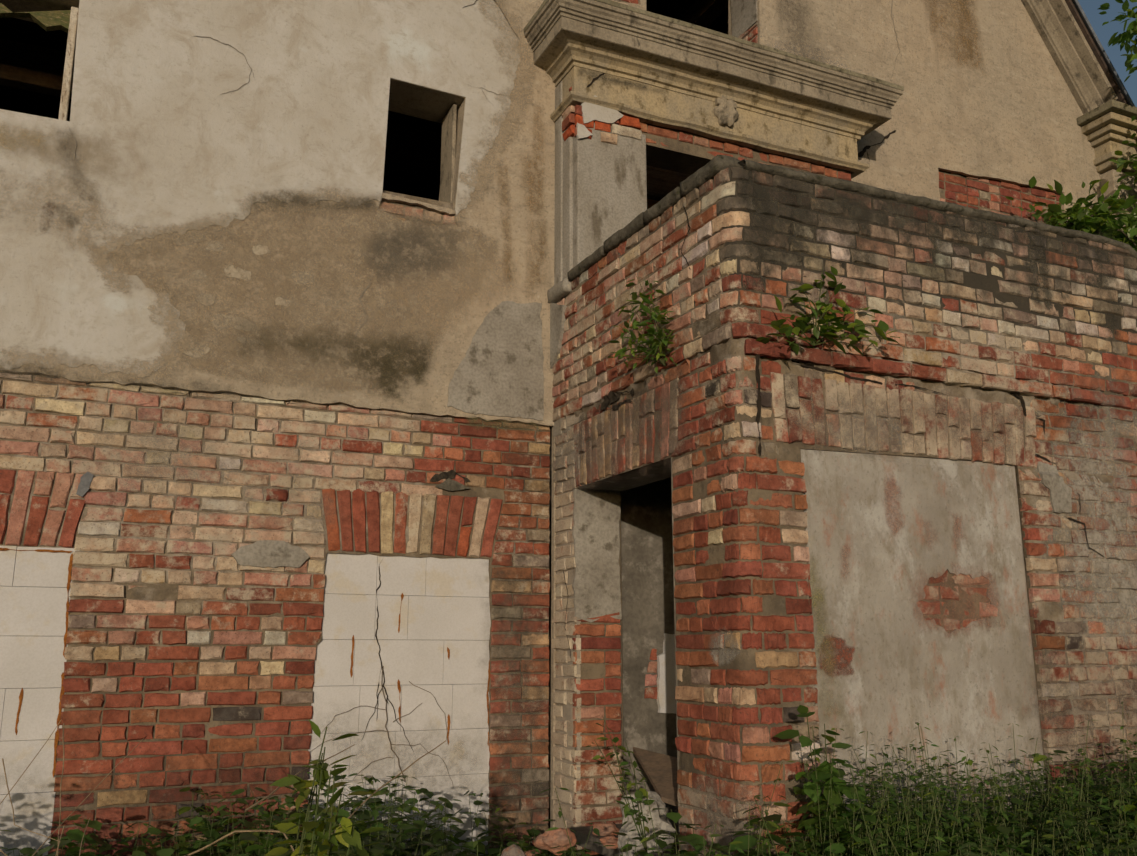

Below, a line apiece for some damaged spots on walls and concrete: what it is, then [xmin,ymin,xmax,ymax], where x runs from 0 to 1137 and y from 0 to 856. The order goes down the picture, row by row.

crack [197,36,254,94]
flaking render [562,86,851,181]
flaking render [938,170,1061,224]
water stain [355,341,425,395]
flaking render [917,570,998,633]
crack [362,567,414,752]
spalling [818,636,855,674]
rust [15,688,23,735]